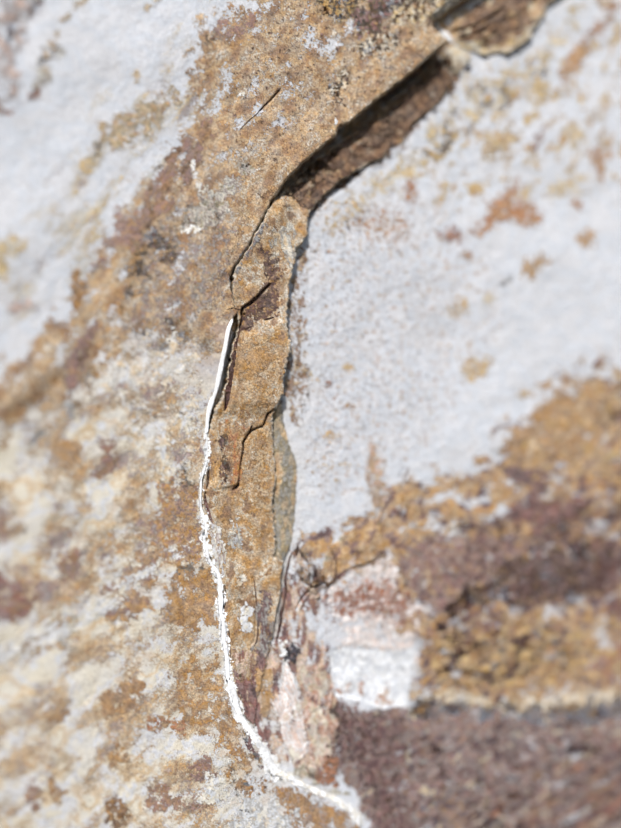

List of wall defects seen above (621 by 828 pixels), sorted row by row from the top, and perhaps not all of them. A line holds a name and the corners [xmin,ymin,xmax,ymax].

crack [241,92,277,128]
crack [197,286,364,826]